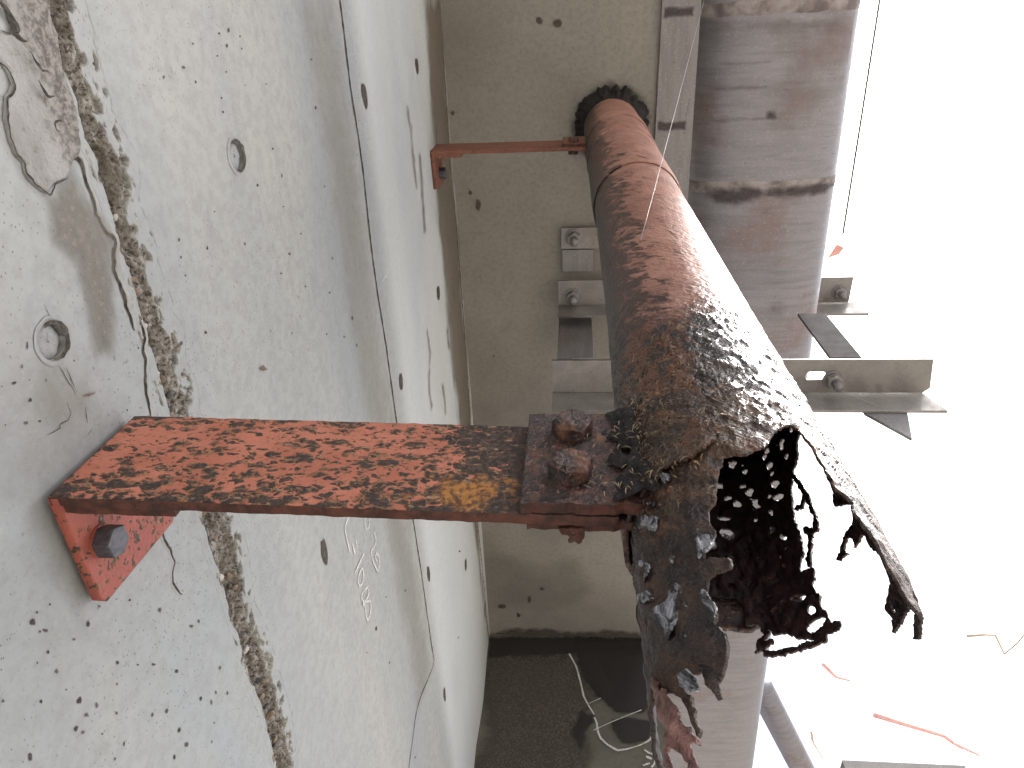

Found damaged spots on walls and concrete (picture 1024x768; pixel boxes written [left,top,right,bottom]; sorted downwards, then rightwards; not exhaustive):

peeling [0,0,81,196]
crack [49,0,202,418]
crack [48,366,91,436]
crack [161,533,183,597]
crack [194,511,300,768]
peeling [701,588,718,623]